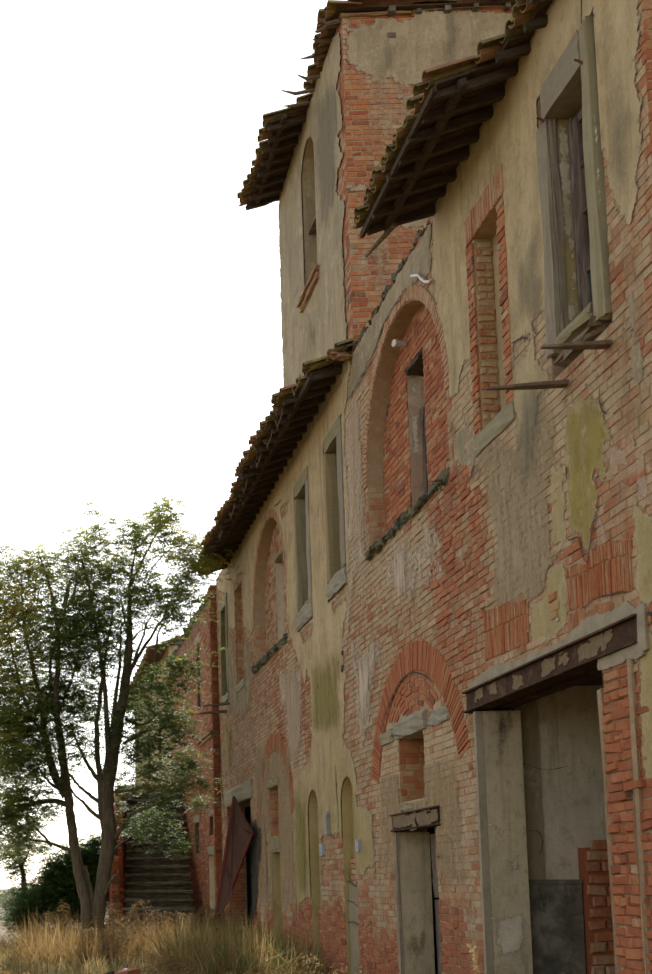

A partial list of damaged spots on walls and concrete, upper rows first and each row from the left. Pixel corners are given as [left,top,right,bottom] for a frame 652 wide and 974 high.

flaking render [402,218,428,229]
flaking render [557,49,652,402]
flaking render [347,431,652,974]